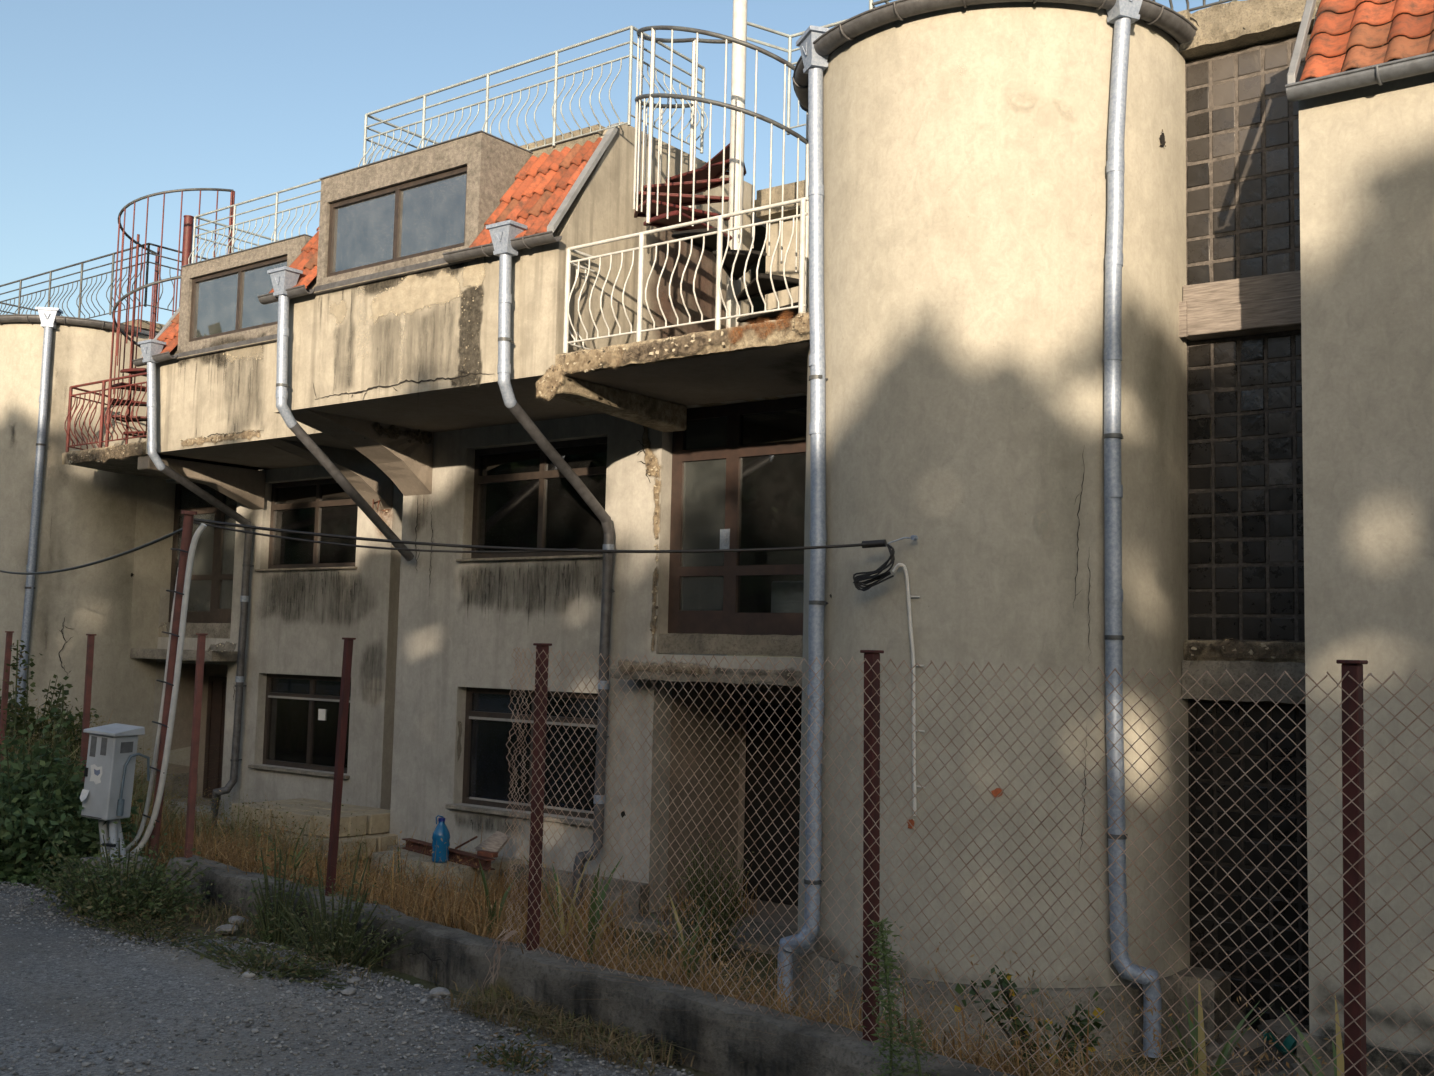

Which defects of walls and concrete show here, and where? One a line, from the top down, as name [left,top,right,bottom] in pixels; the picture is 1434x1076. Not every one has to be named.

damp [338,258,478,384]
damp [448,284,484,387]
spalling [536,330,727,400]
damp [463,561,601,612]